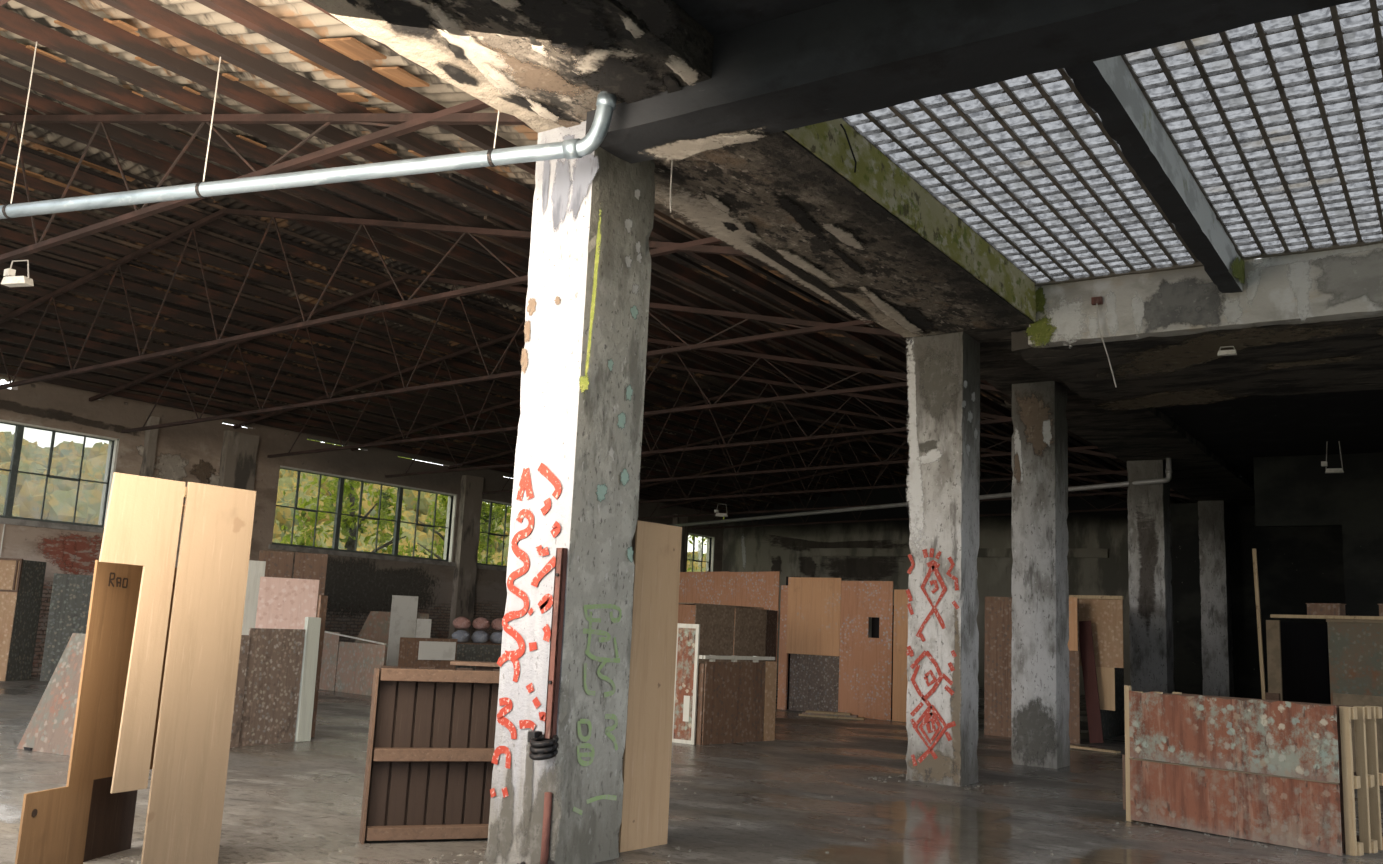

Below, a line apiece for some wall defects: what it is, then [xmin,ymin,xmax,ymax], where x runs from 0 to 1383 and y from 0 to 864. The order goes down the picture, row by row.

peeling [404,0,699,128]
peeling [625,219,642,267]
peeling [634,182,925,337]
peeling [1142,277,1225,333]
peeling [1312,250,1383,307]
flaking render [38,534,102,575]
water stain [1012,698,1058,766]